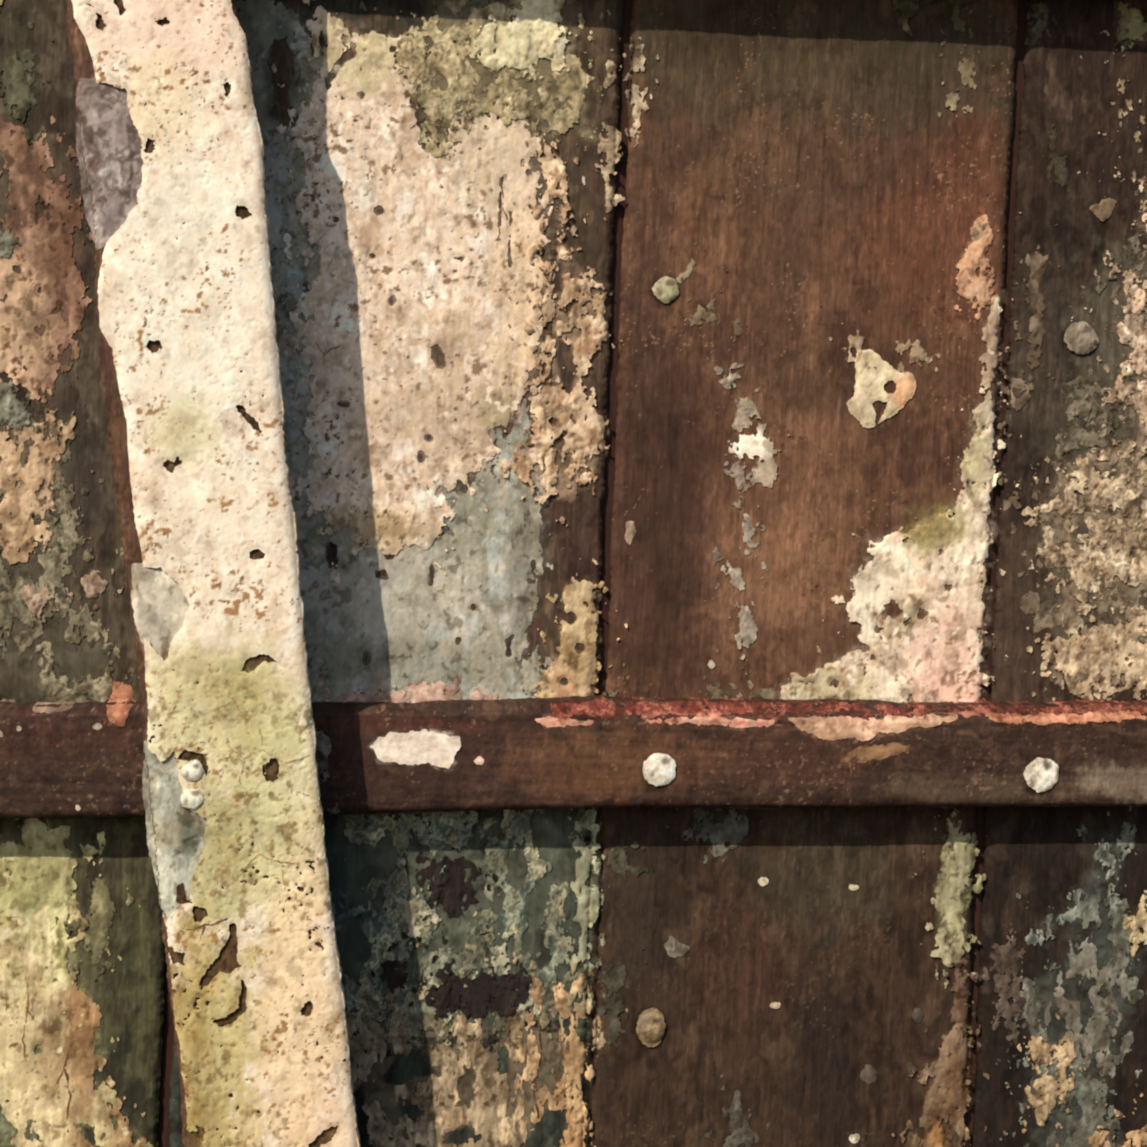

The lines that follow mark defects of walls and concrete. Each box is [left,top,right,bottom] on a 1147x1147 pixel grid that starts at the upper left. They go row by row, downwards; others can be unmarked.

peeling [96,13,107,31]
peeling [114,0,126,15]
peeling [0,49,190,730]
peeling [235,0,1147,770]
peeling [142,740,208,922]
peeling [315,731,331,786]
peeling [0,818,154,1147]
peeling [167,945,185,965]
peeling [327,802,648,1147]
peeling [892,806,1147,1147]
peeling [308,1126,338,1147]
peeling [860,1064,877,1084]